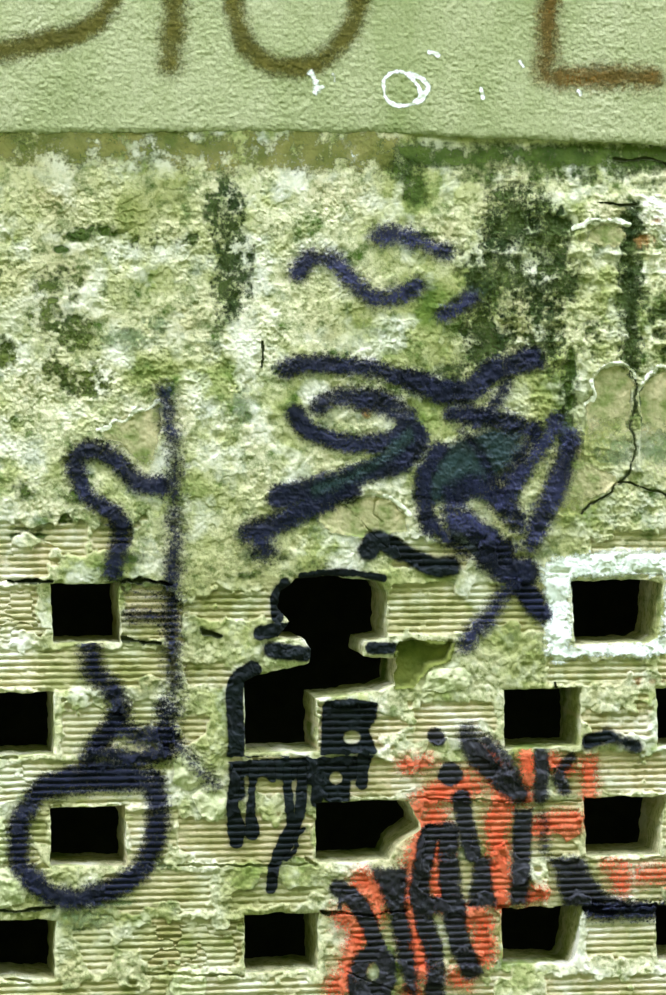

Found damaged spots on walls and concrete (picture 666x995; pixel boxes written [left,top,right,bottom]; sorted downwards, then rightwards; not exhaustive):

damp [435,181,601,446]
damp [614,199,666,384]
flaking render [318,492,412,538]
crack [581,376,666,515]
spalling [393,640,456,690]